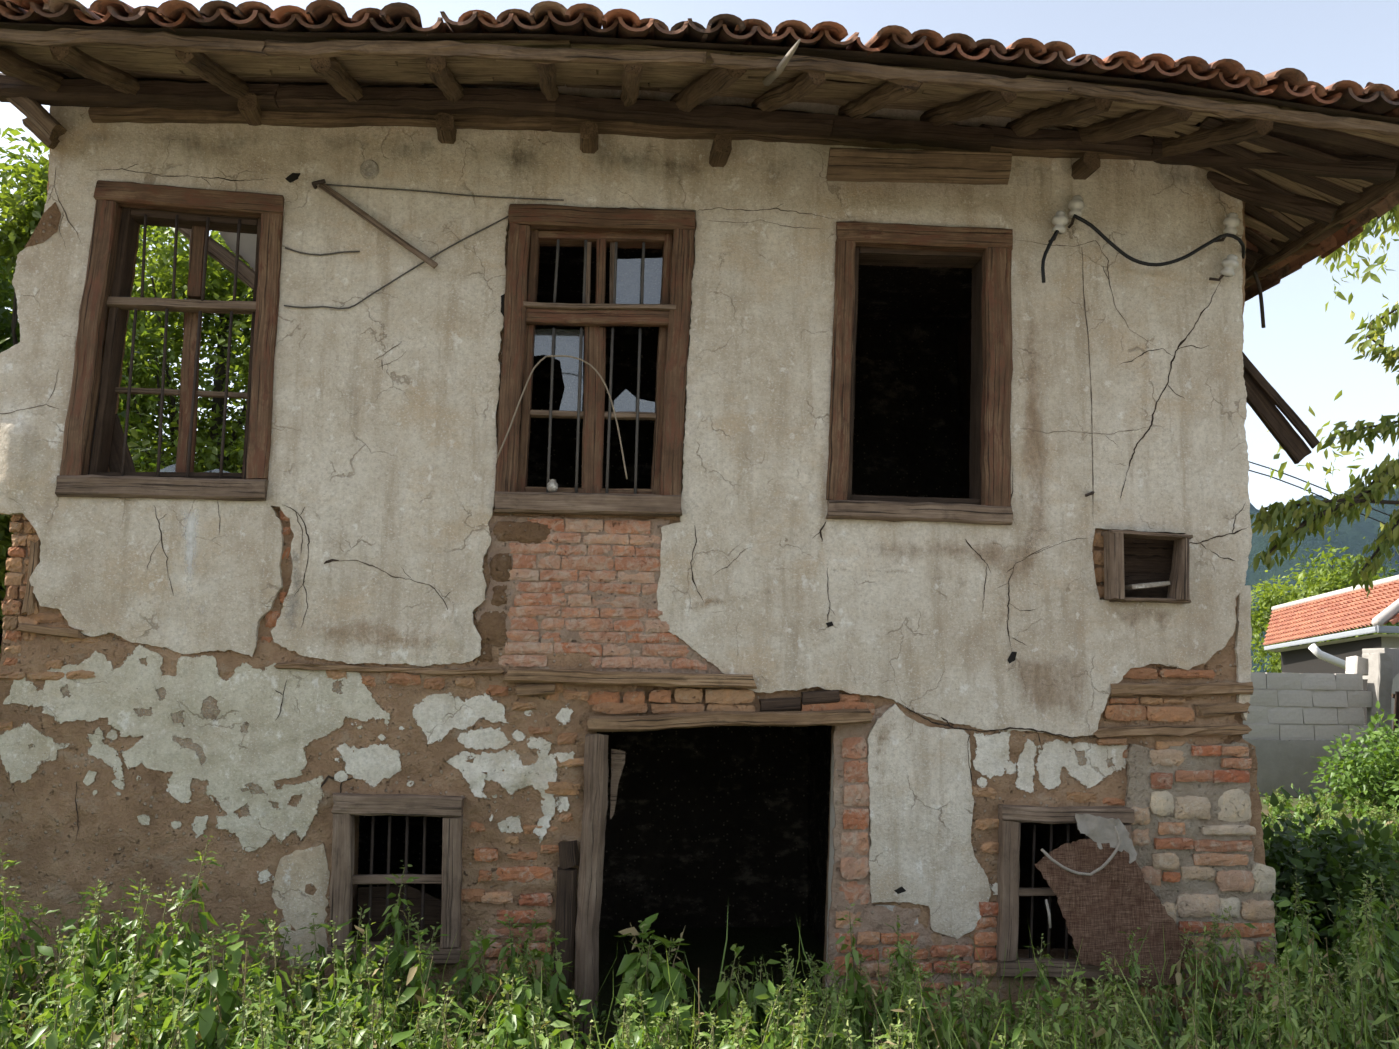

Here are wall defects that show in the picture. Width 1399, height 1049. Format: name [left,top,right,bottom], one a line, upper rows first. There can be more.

crack [1018,240,1221,498]
crack [147,506,174,596]
crack [690,525,748,602]
crack [966,538,1087,651]
peeling [0,509,1004,1048]
spalling [972,664,1278,1049]